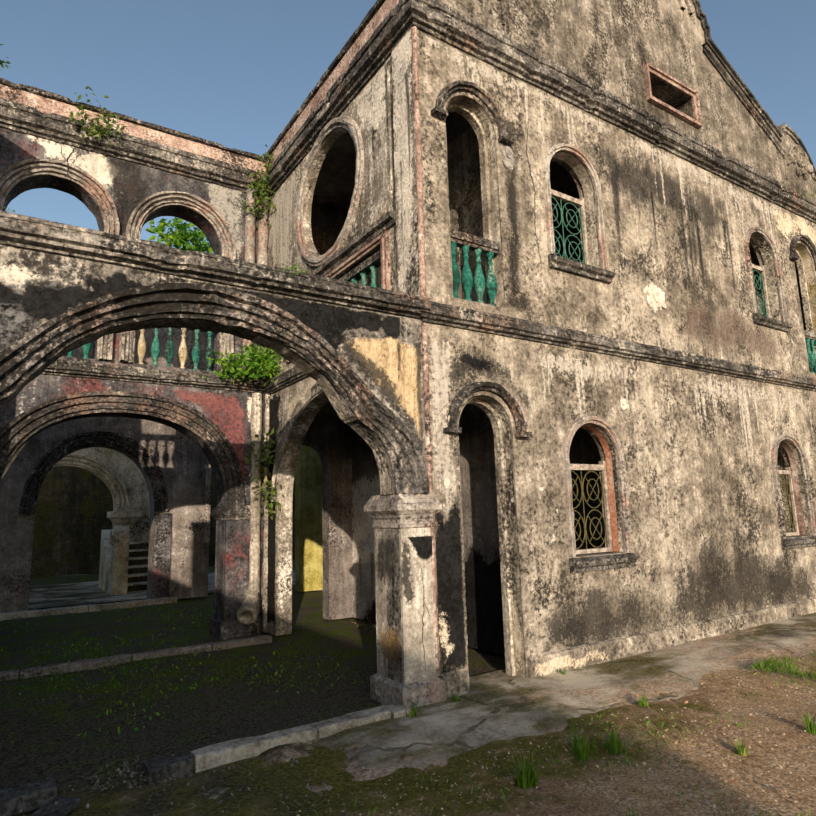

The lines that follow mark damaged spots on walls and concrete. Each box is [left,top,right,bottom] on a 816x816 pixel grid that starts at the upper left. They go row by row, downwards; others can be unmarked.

damp [384,57,395,210]
damp [0,270,144,353]
peeling [643,280,666,313]
damp [224,286,423,453]
damp [448,345,529,409]
damp [534,353,629,417]
damp [545,537,816,652]